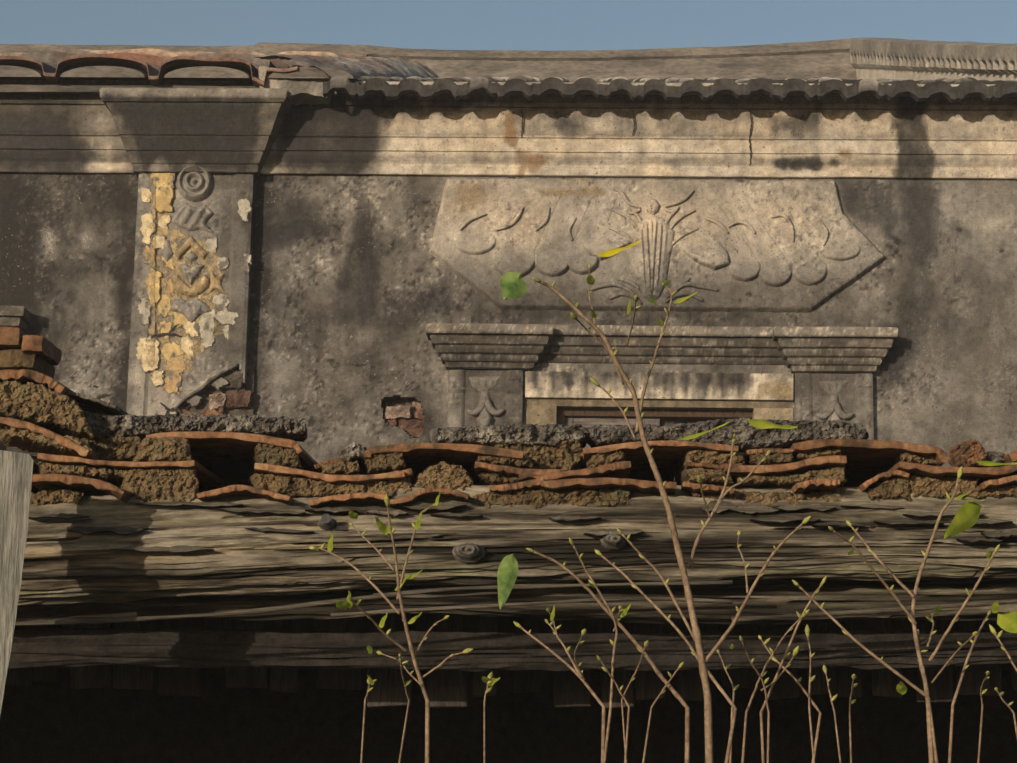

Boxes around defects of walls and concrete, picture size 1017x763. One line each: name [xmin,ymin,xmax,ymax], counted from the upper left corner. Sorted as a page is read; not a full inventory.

crack [746,110,754,166]
leakage [775,157,838,170]
leakage [845,97,935,261]
peeling [136,173,254,416]
flaking render [382,397,424,438]